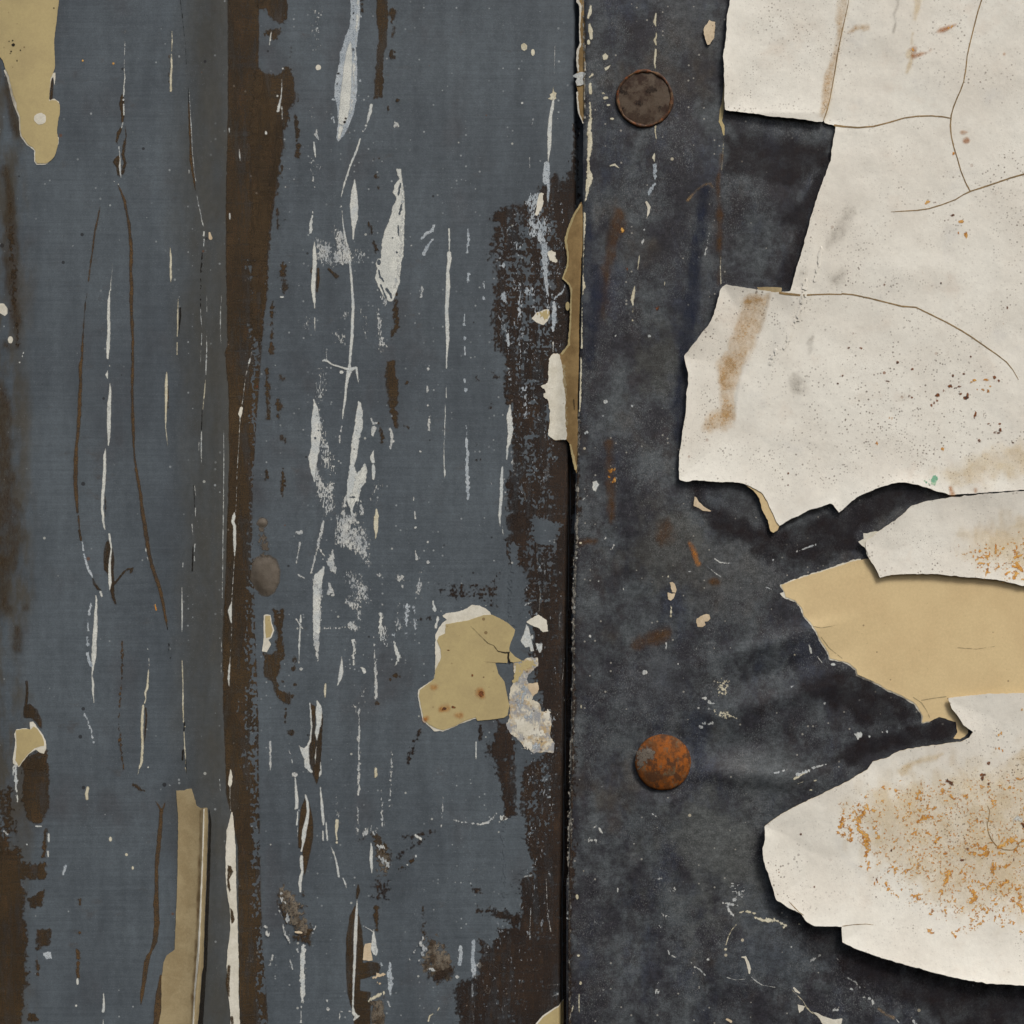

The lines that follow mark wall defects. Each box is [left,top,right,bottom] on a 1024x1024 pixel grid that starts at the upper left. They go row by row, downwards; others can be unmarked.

peeling [0,0,60,165]
peeling [353,0,400,111]
crack [823,0,1024,212]
peeling [0,170,24,363]
spalling [368,183,405,299]
peeling [679,0,1024,586]
crack [779,292,1019,380]
peeling [407,118,599,1024]
corrosion [964,532,1024,580]
peeling [159,789,211,1024]
peeling [762,693,1024,986]
corrosion [836,762,1024,938]